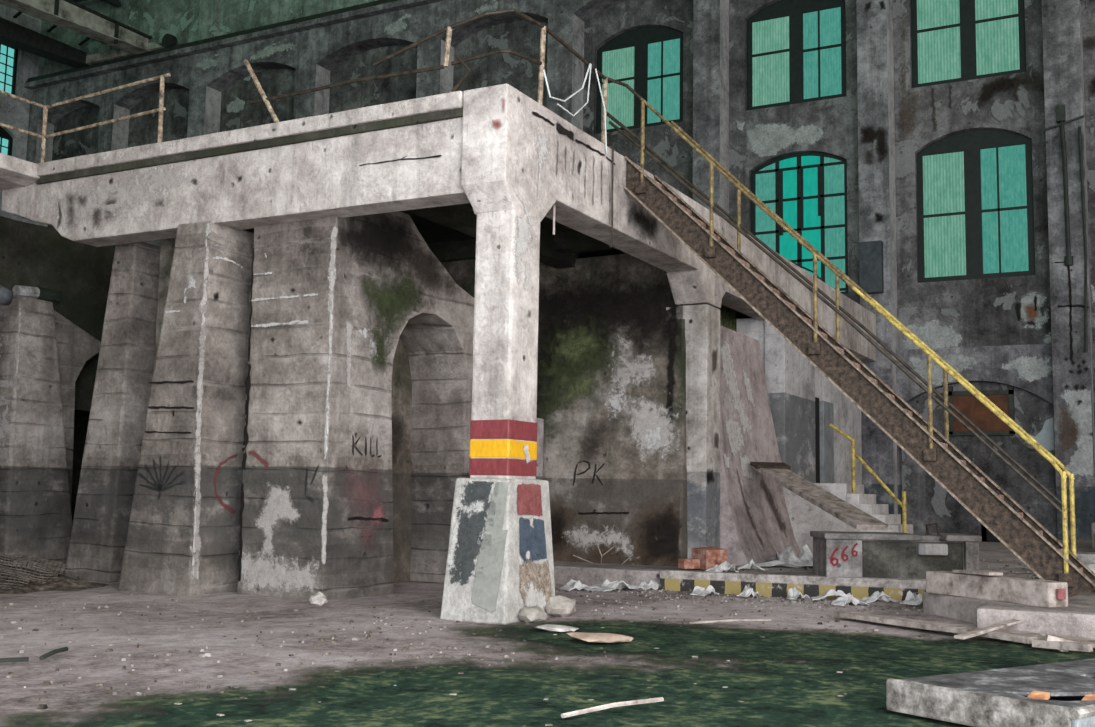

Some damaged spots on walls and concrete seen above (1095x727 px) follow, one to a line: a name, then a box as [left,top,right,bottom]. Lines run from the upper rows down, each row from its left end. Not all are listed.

water stain [251,213,449,459]
water stain [537,272,683,461]
flaking render [902,320,977,386]
flaking render [1002,355,1052,382]
peeling [241,487,319,593]